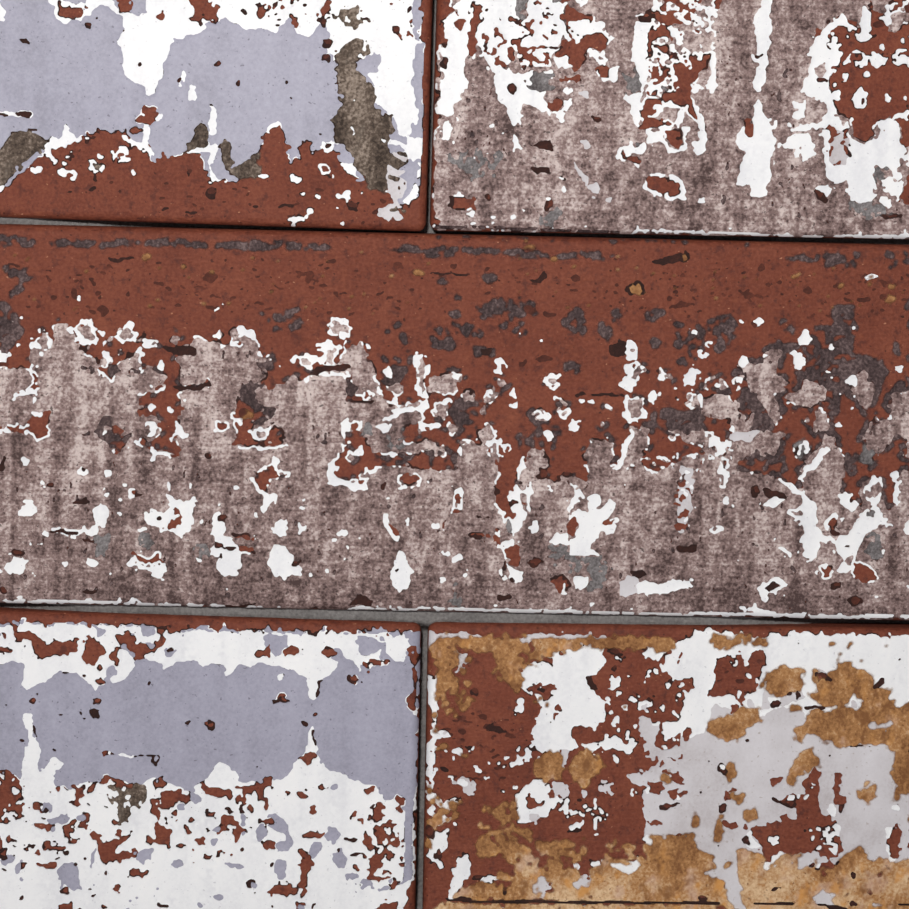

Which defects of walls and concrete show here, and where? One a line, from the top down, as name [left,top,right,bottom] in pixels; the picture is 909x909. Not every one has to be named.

peeling [0,0,909,239]
spalling [652,250,690,265]
spalling [625,280,645,296]
peeling [0,317,909,909]
crack [446,898,720,906]
crack [754,899,794,907]
crack [817,901,847,909]